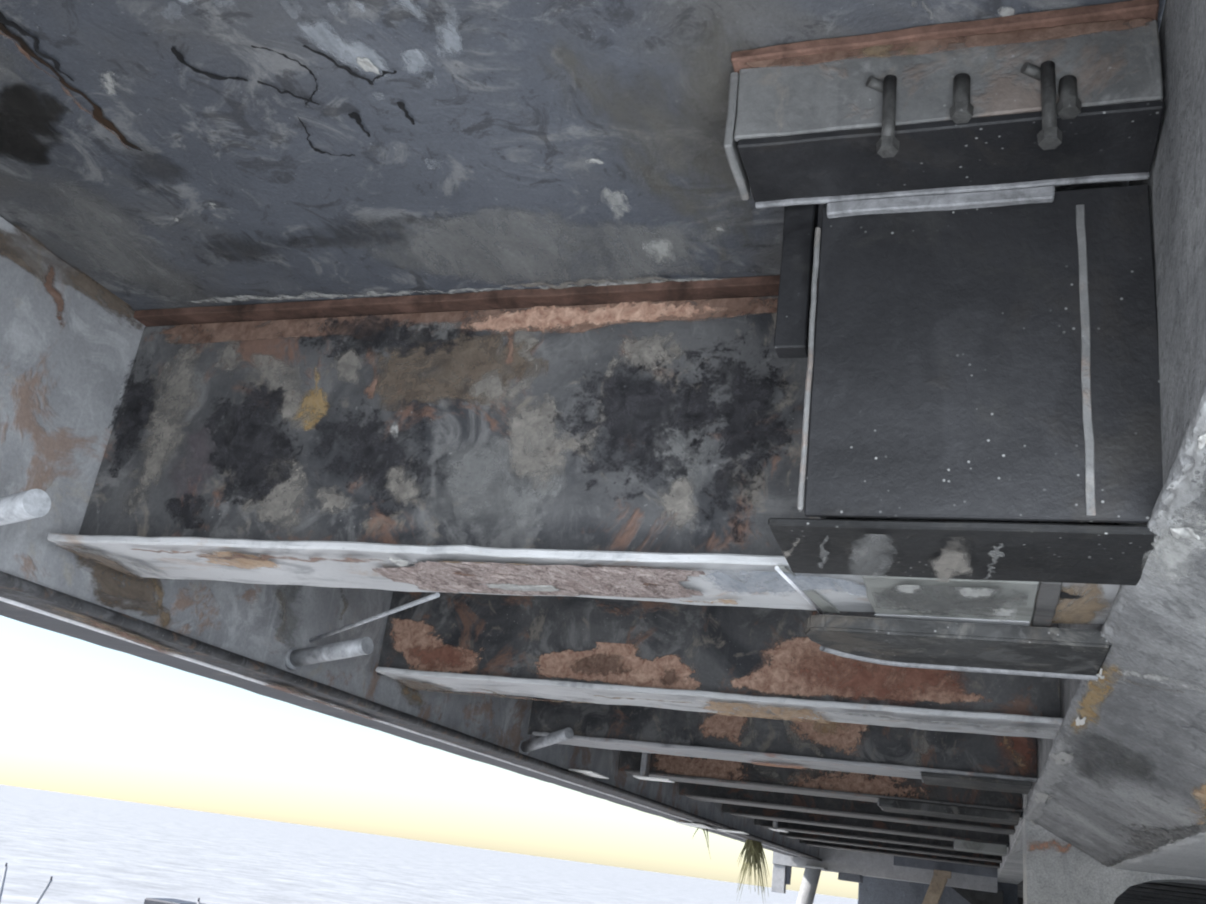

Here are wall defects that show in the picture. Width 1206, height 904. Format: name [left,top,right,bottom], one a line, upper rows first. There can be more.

leakage [0,59,67,165]
crack [0,12,143,151]
crack [171,45,415,157]
leakage [379,323,459,348]
corrosion [161,297,778,411]
peeling [372,557,706,599]
leakage [1152,513,1206,580]
corrosion [389,618,1043,799]
spalling [1102,785,1206,867]